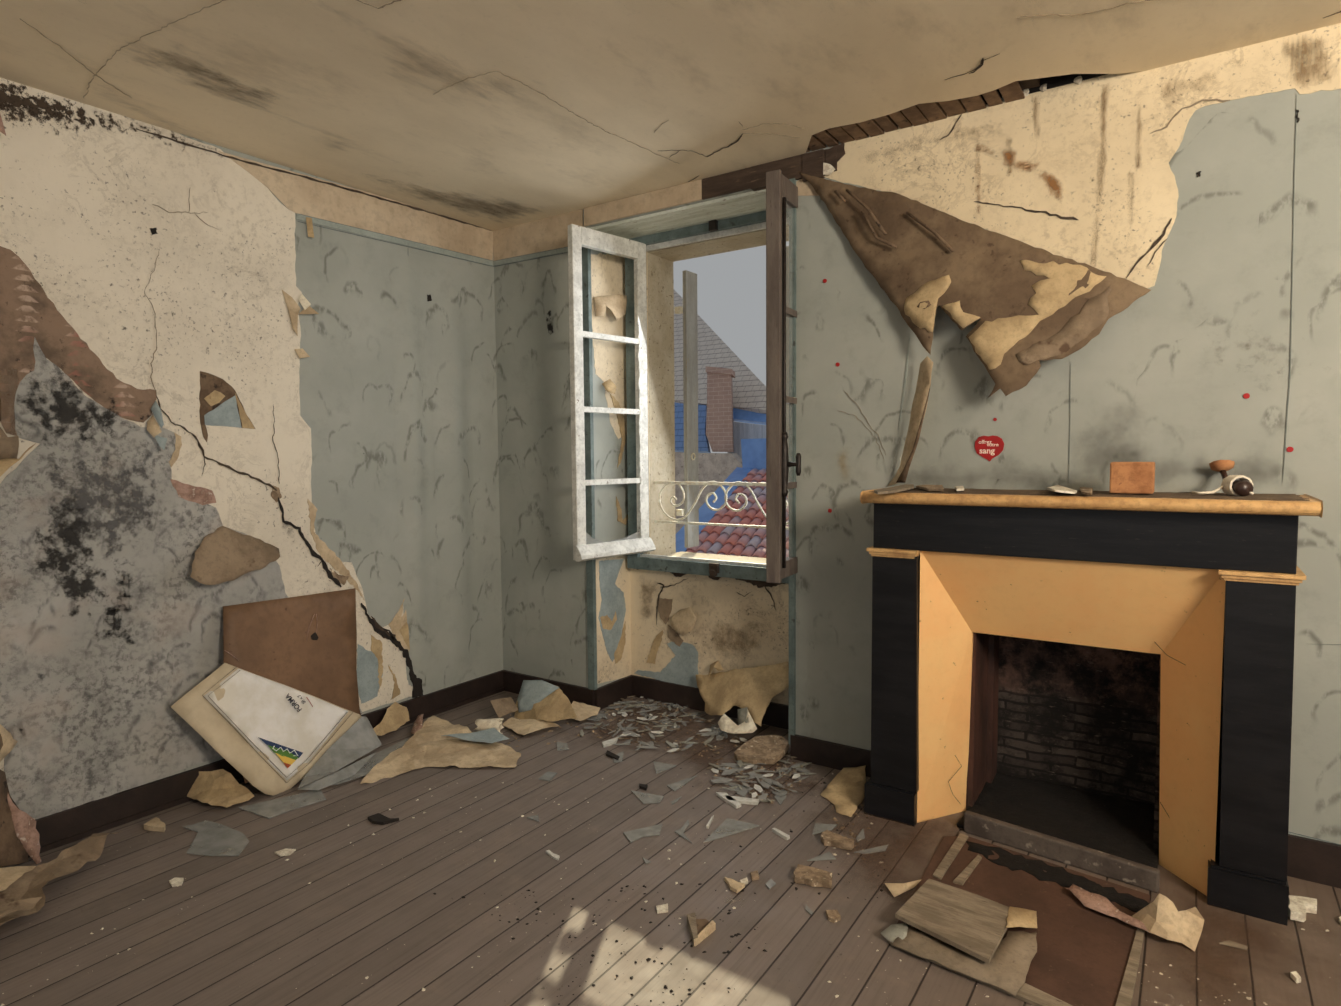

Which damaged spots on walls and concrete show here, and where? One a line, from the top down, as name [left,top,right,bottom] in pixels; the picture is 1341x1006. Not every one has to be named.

leakage [0,84,220,156]
crack [20,0,224,98]
crack [357,0,401,9]
crack [433,71,806,182]
crack [945,53,1000,80]
peeling [823,23,1341,288]
leakage [17,373,119,441]
peeling [0,78,423,712]
crack [144,255,417,684]
leakage [35,455,155,644]
peeling [596,556,639,684]
spalling [708,576,785,588]